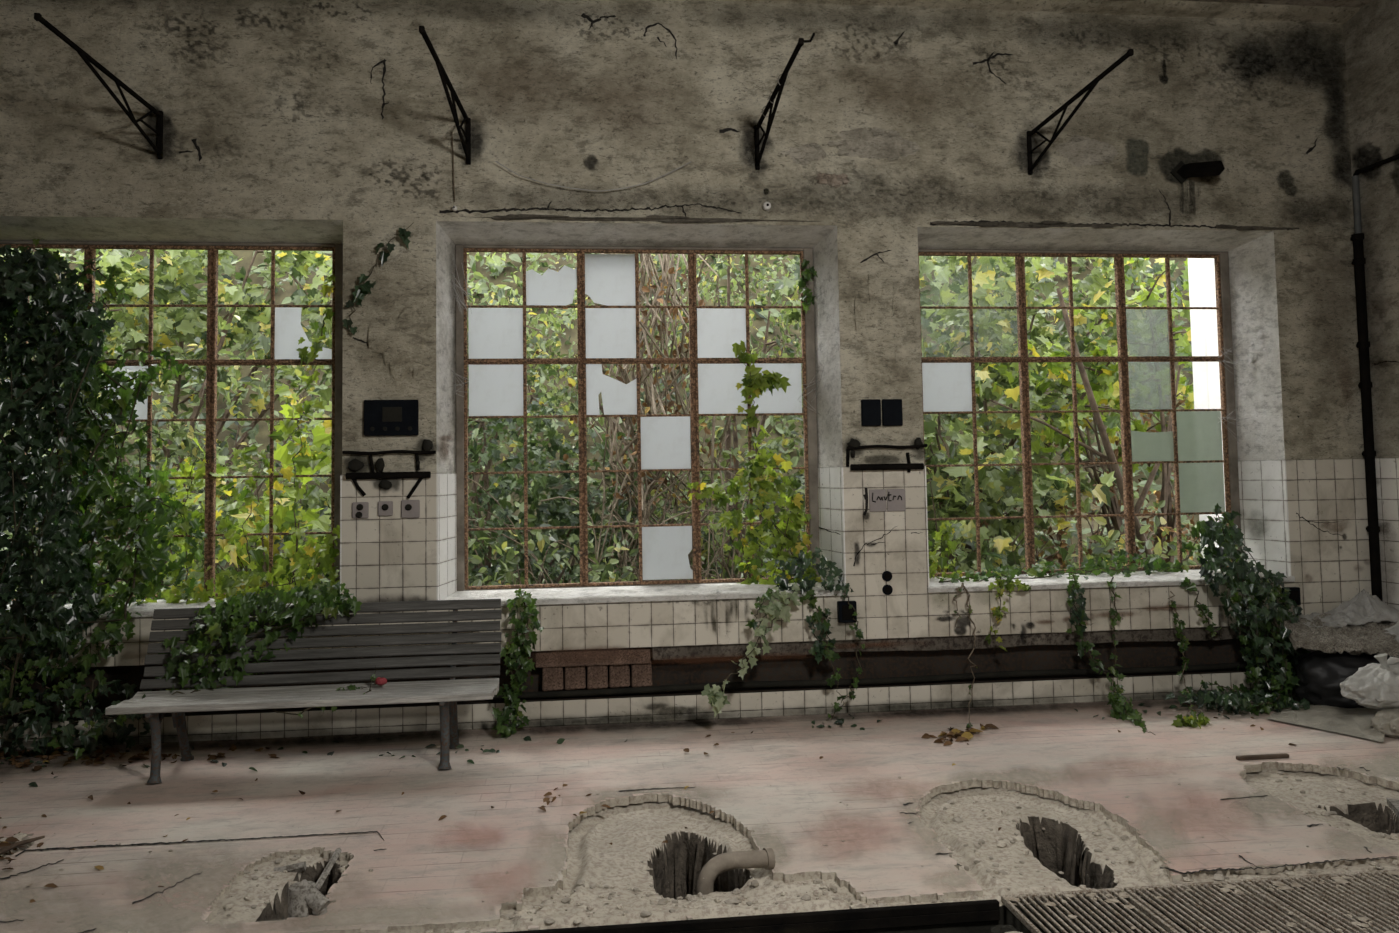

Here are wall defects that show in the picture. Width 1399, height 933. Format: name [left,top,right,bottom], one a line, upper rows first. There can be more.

crack [581,13,677,59]
crack [972,51,1013,84]
damp [1237,32,1399,195]
damp [1127,139,1220,213]
spalling [0,833,45,857]
spalling [208,848,350,925]
spalling [481,801,870,933]
spalling [920,787,1183,905]
spalling [1244,769,1399,852]